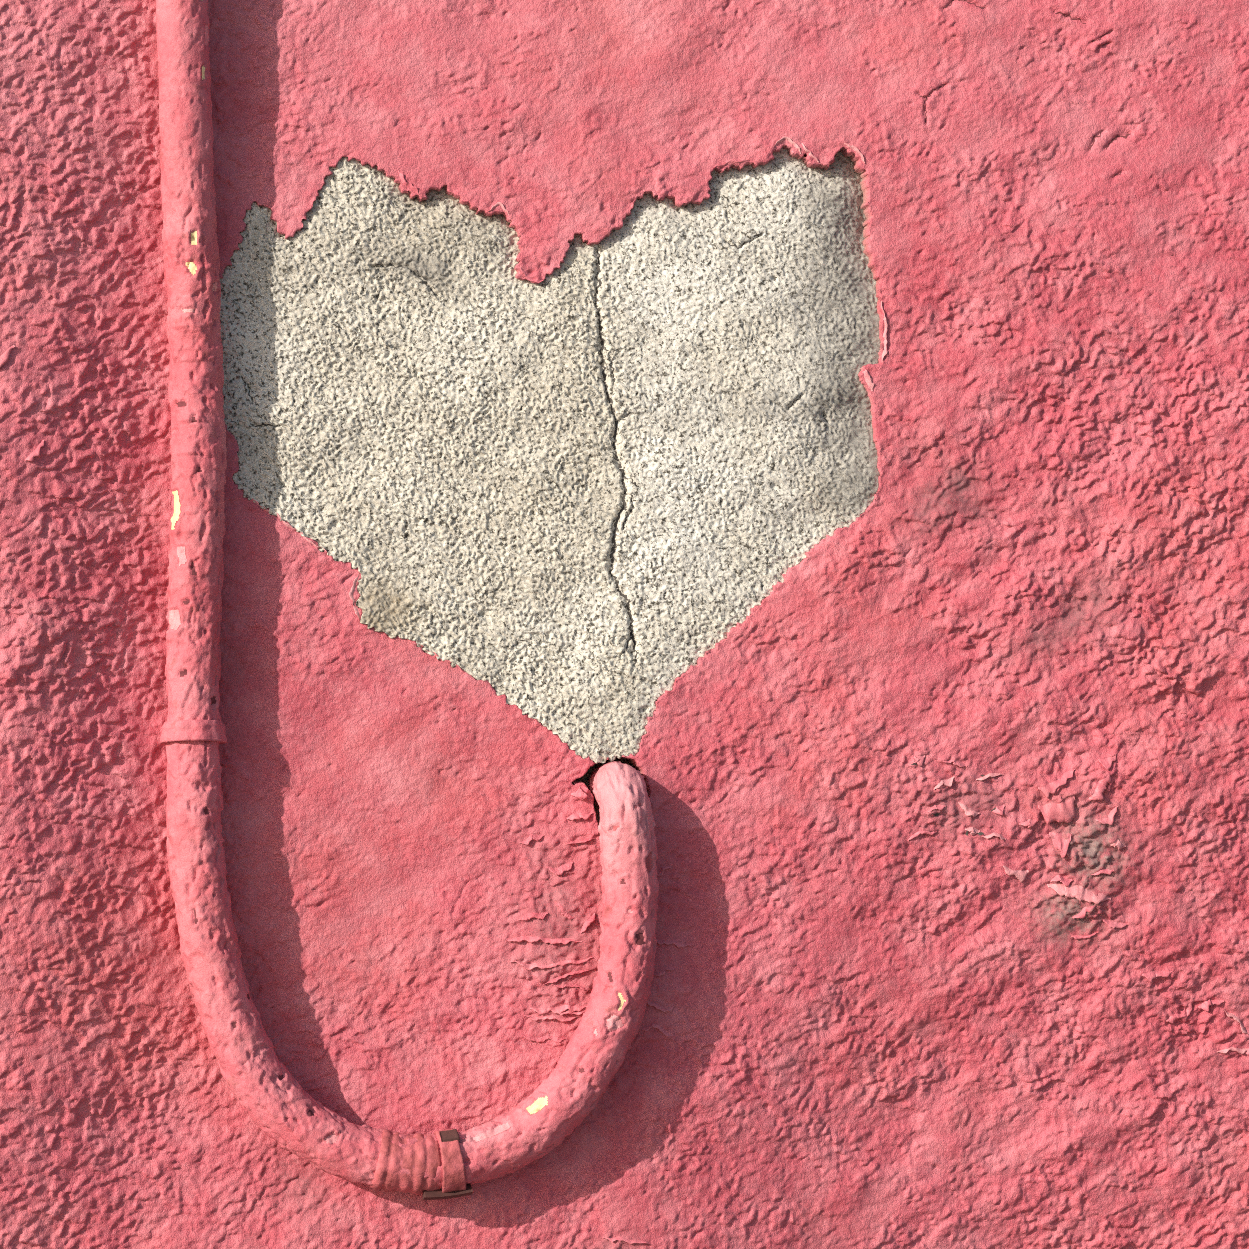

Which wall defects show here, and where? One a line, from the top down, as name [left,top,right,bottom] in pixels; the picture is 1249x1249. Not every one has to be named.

flaking render [219,137,888,763]
crack [593,250,640,664]
peeling [567,786,592,821]
peeling [927,759,1006,840]
spalling [1019,754,1128,939]
peeling [546,861,573,875]
peeling [1003,866,1029,883]
peeling [502,903,595,945]
peeling [510,957,593,990]
peeling [524,1005,587,1022]
peeling [594,972,626,1037]